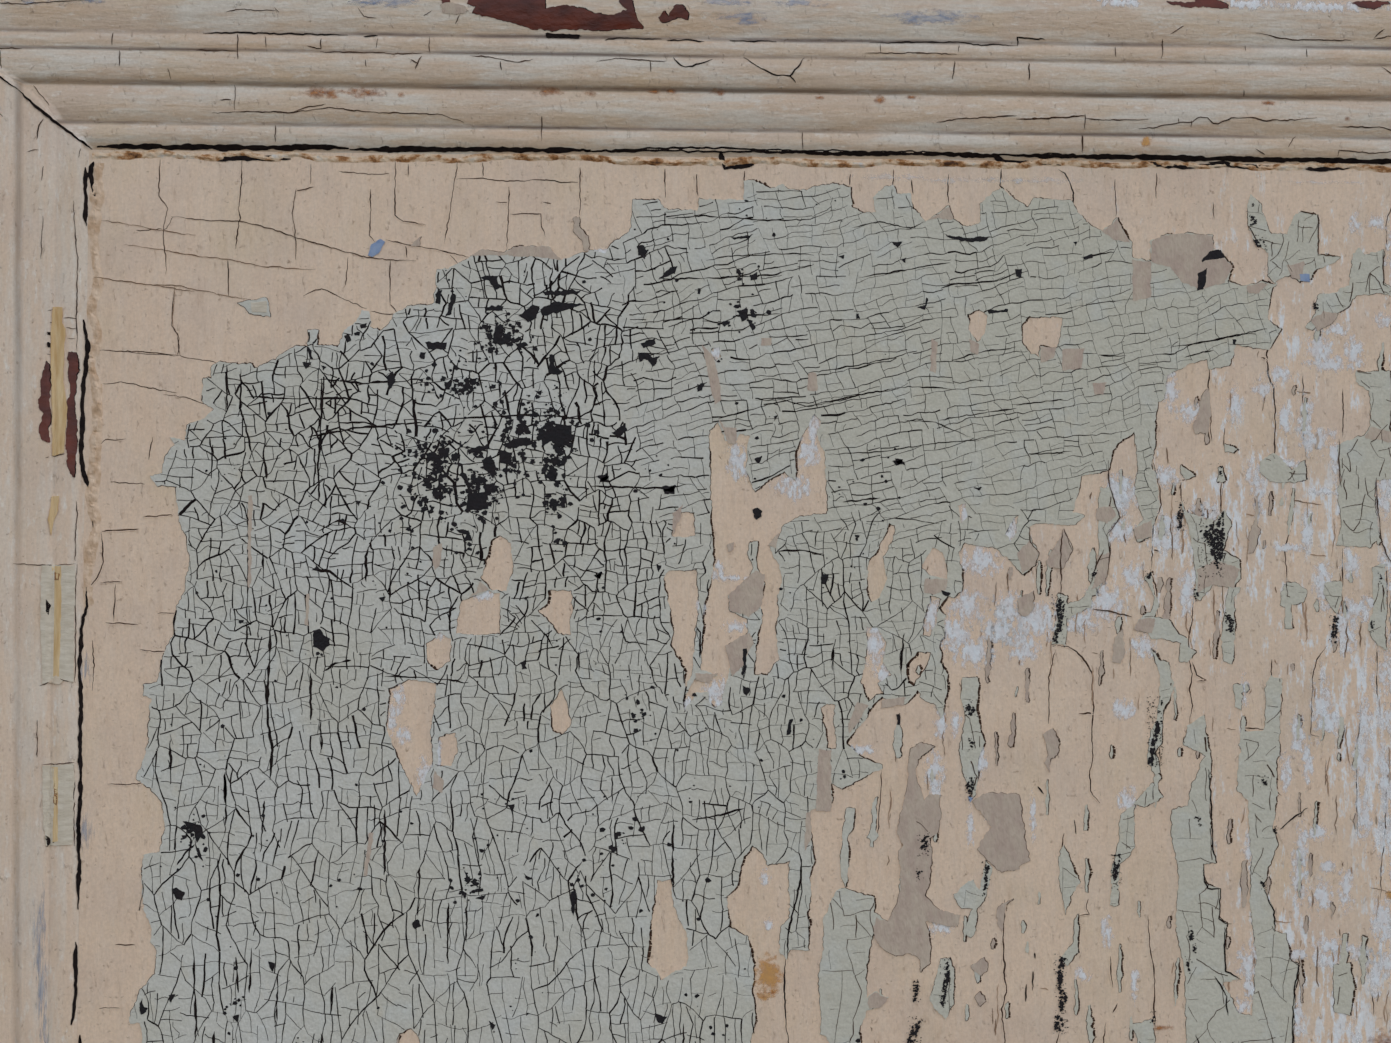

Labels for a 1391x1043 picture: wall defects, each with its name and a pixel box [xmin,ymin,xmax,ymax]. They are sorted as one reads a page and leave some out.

peeling [440,0,690,39]
peeling [1167,0,1391,13]
crack [0,47,1391,502]
crack [246,509,274,852]
crack [385,536,580,796]
peeling [448,855,520,904]
peeling [582,813,645,867]
peeling [612,677,673,759]
peeling [38,150,1391,710]
crack [727,832,816,1043]
crack [592,386,1070,712]
crack [821,202,1310,865]